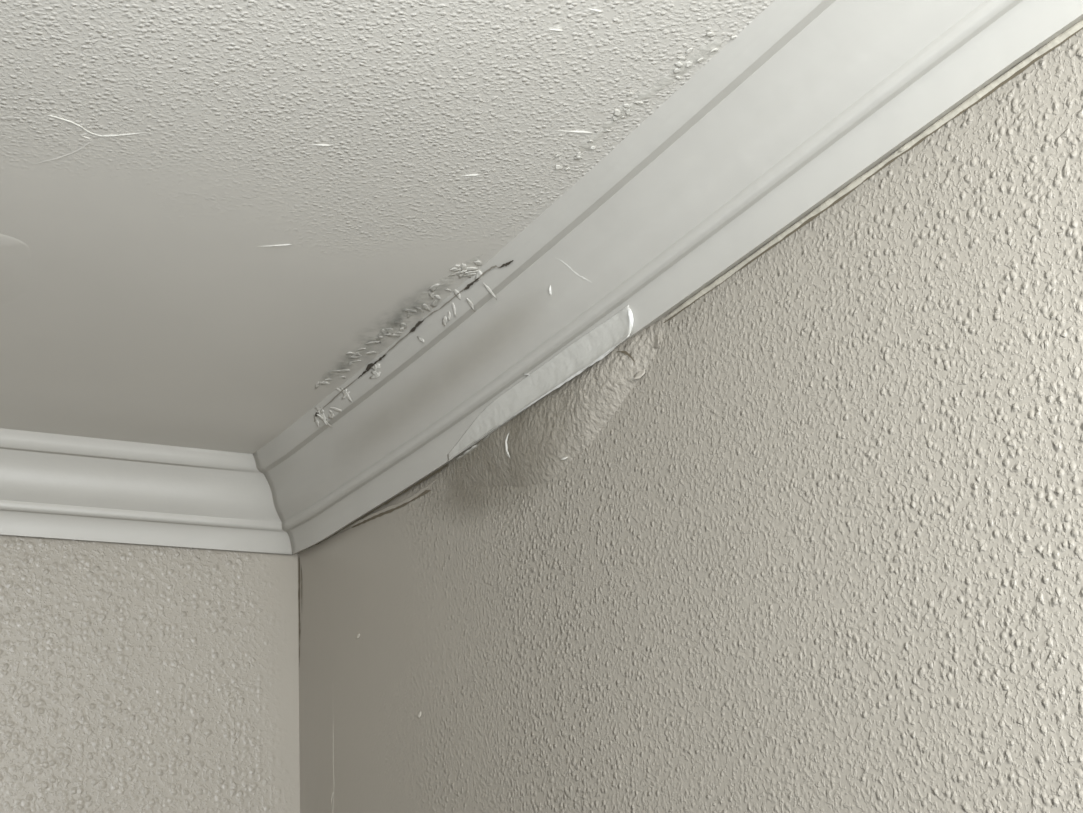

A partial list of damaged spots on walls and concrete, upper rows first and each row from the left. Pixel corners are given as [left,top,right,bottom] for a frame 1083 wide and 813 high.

peeling [314,254,514,428]